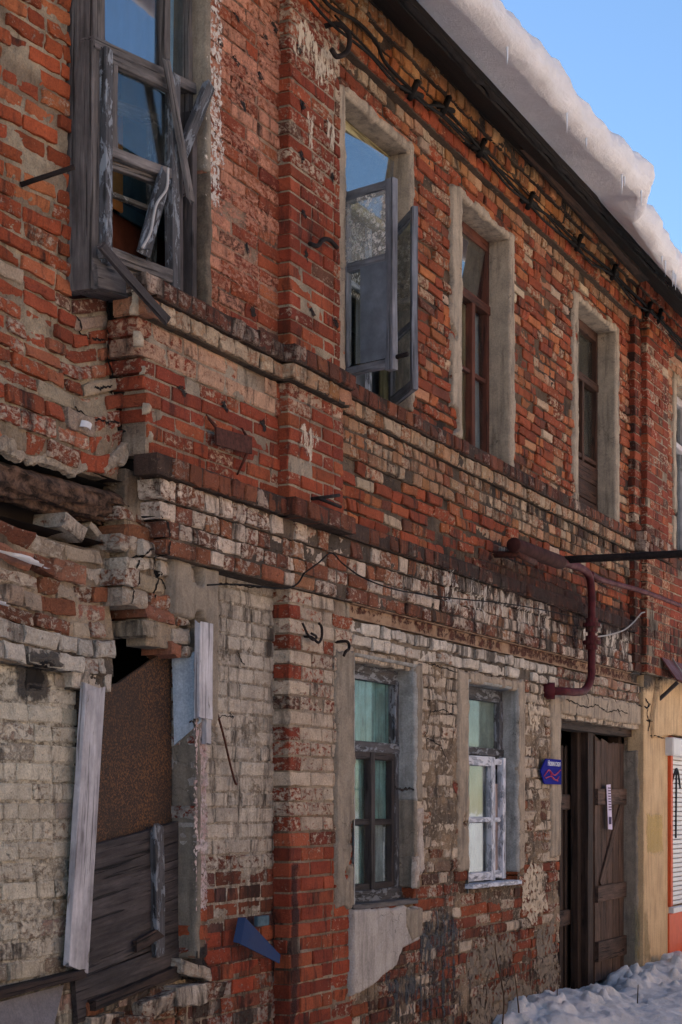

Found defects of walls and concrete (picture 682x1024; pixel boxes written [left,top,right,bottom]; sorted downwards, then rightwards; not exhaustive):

peeling [204,0,306,321]
spalling [0,512,104,547]
crack [566,689,665,739]
peeling [189,719,209,912]
spalling [347,905,423,997]